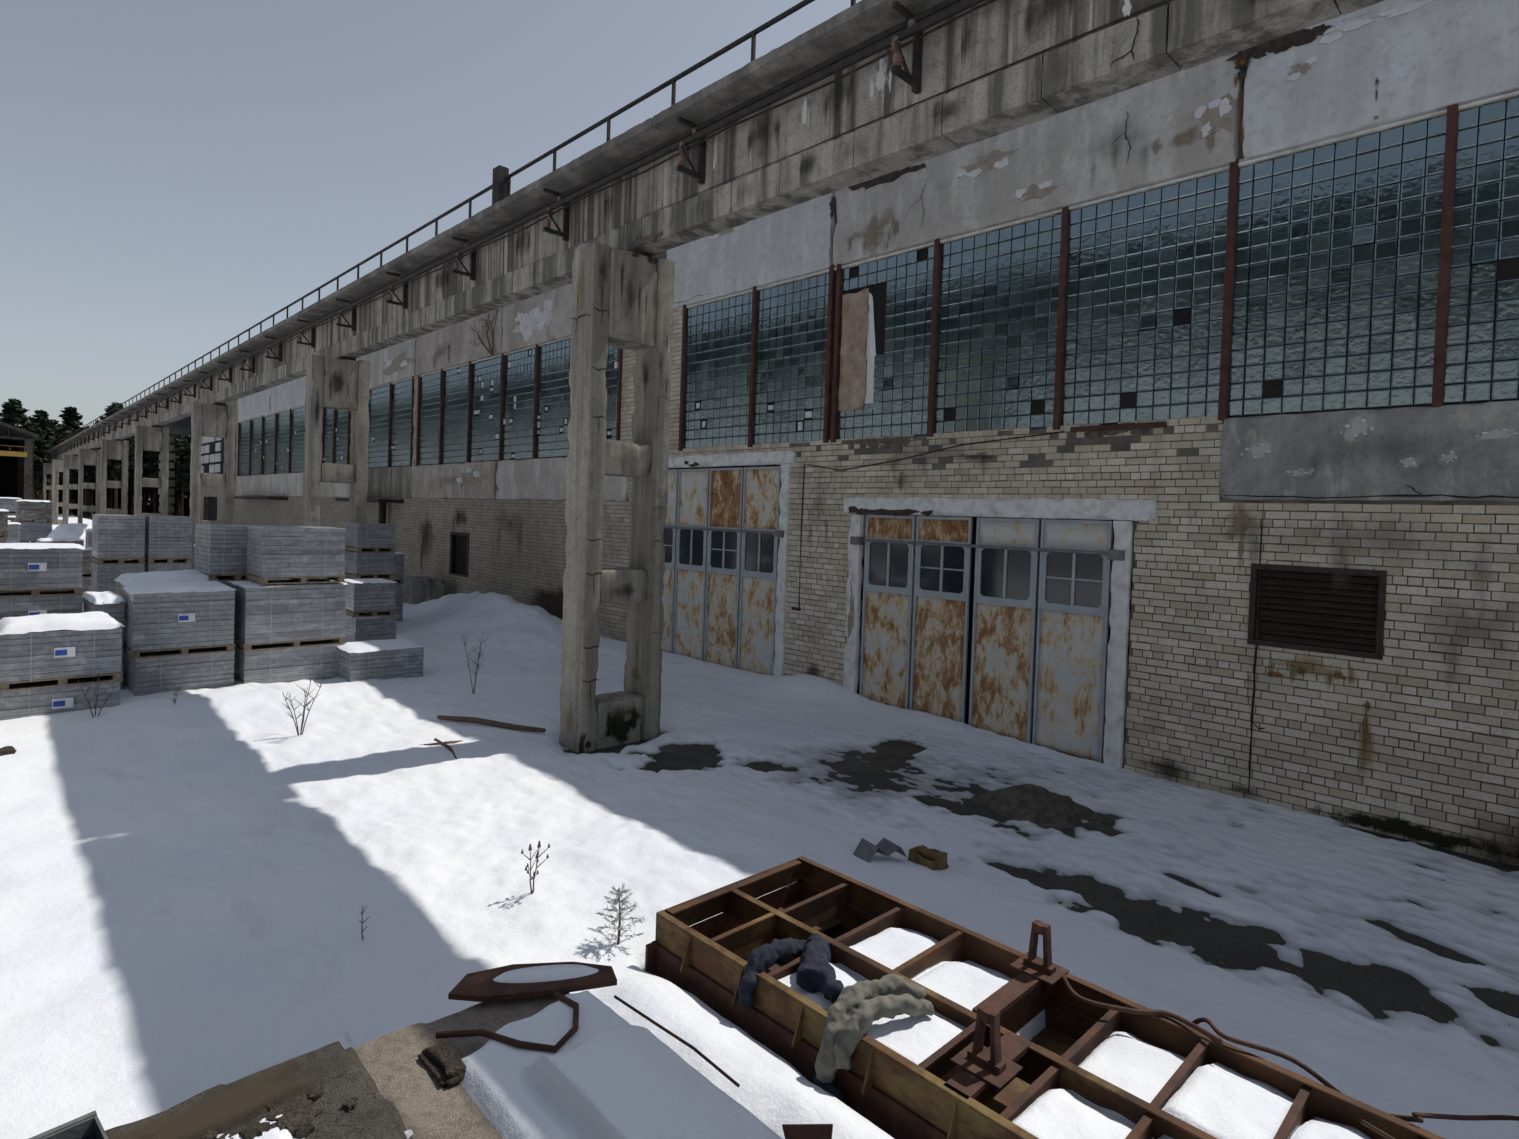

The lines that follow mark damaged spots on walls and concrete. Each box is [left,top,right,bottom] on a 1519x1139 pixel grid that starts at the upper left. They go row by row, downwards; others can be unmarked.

spalling [1122,0,1132,17]
peeling [1194,0,1433,137]
crack [639,0,1171,218]
peeling [956,148,1020,179]
peeling [1014,179,1057,202]
corrosion [1360,702,1370,767]